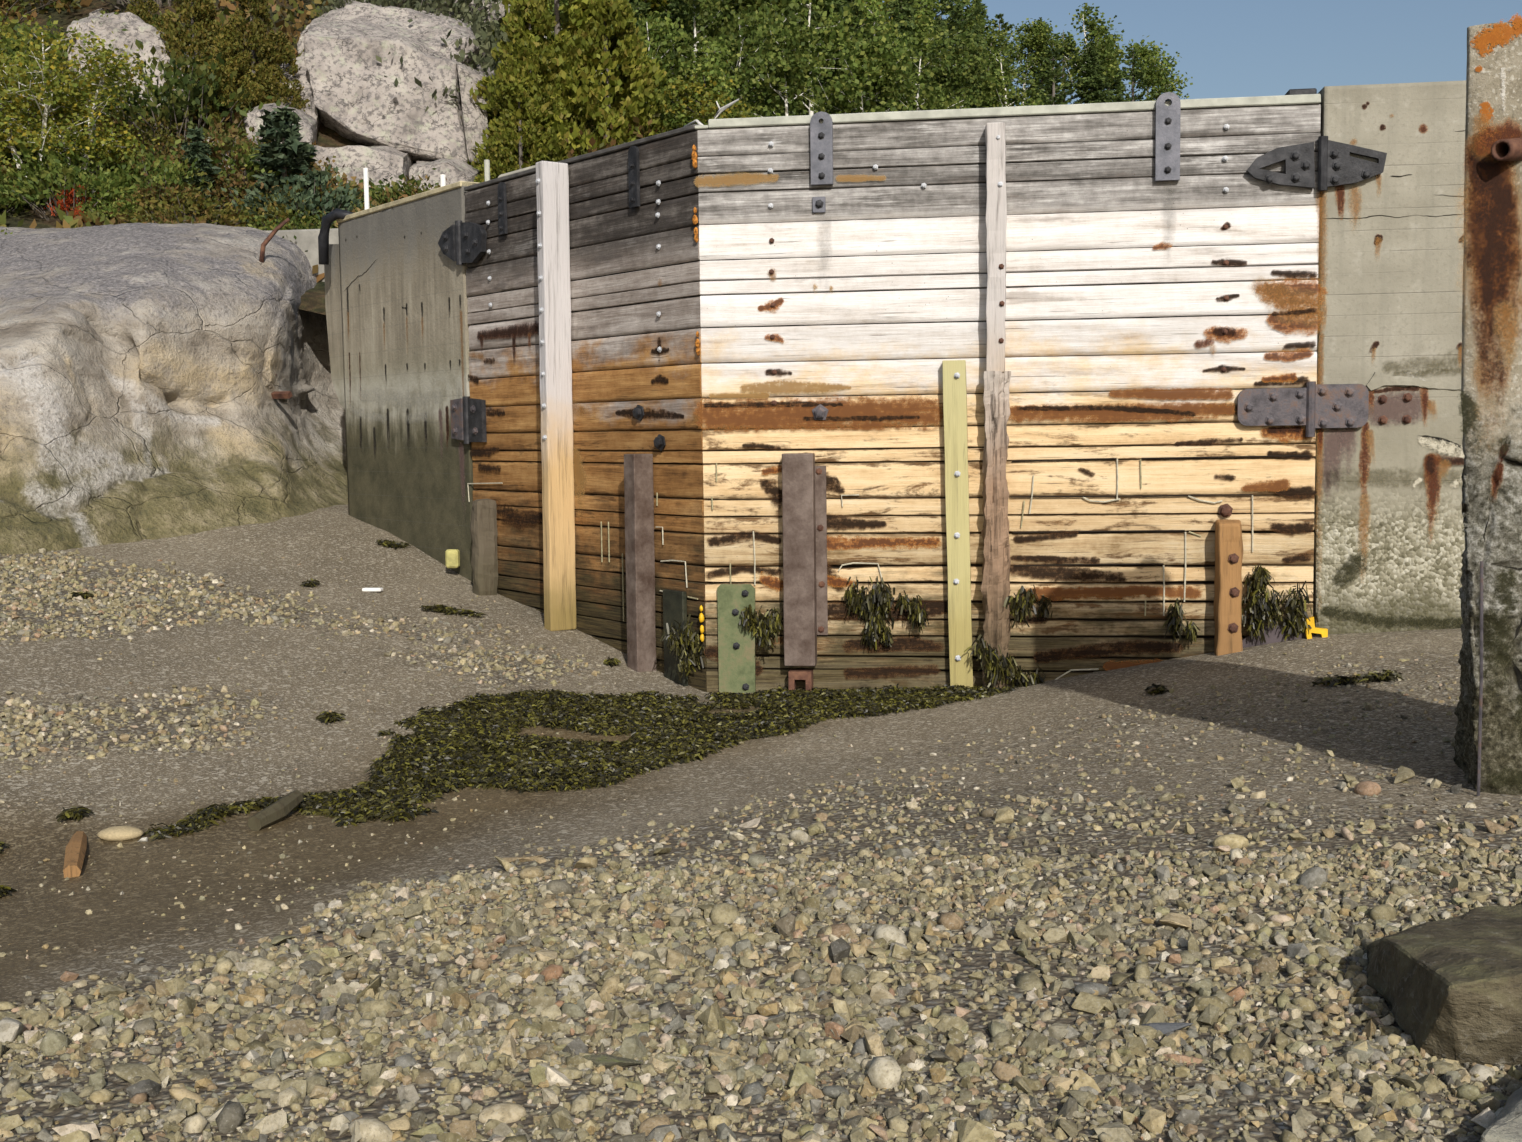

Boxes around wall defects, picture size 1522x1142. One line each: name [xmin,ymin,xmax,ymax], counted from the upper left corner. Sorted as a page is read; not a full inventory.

corrosion [1254,185,1359,386]
corrosion [1457,120,1522,387]
corrosion [1194,326,1248,353]
corrosion [1262,386,1436,549]
corrosion [1425,453,1464,539]
crack [1500,439,1522,465]
crack [1484,519,1522,570]
crack [1512,620,1522,691]